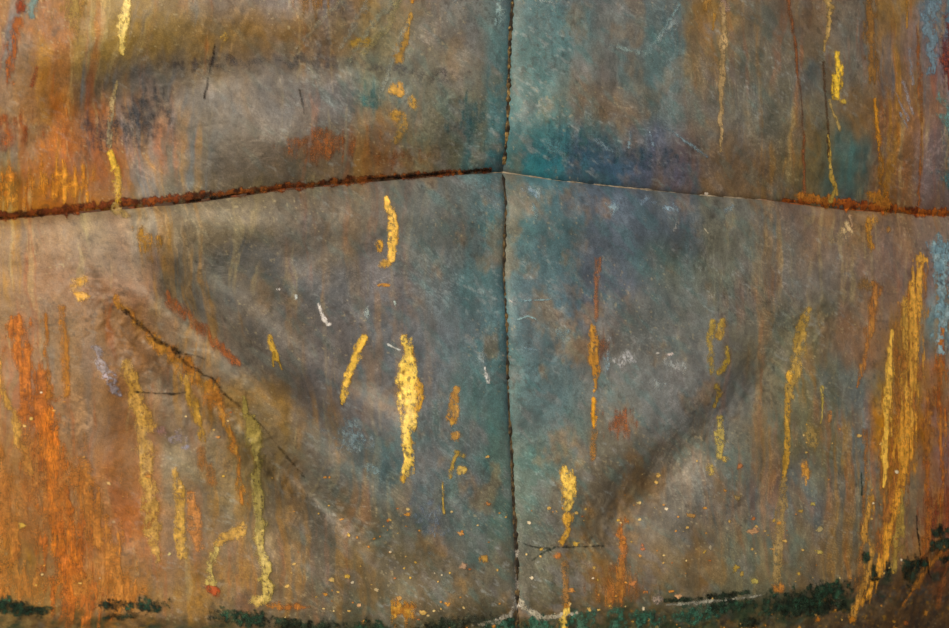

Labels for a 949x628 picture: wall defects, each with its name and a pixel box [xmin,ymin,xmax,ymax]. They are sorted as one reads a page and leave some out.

corrosion [5,0,25,82]
corrosion [0,152,492,221]
corrosion [782,0,949,250]
corrosion [0,306,146,628]
corrosion [113,291,248,505]
corrosion [854,262,949,608]